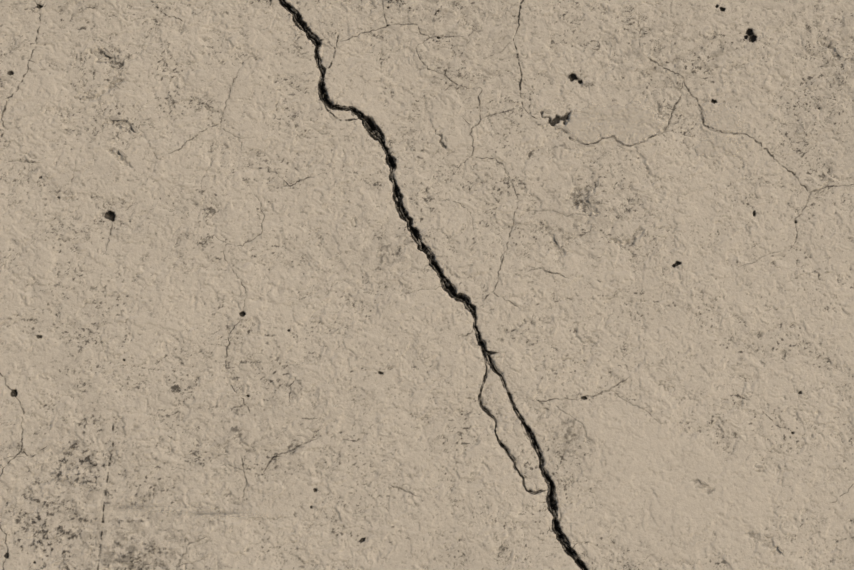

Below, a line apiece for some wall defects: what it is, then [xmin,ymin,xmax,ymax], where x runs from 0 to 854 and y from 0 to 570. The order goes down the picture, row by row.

crack [280,0,588,570]